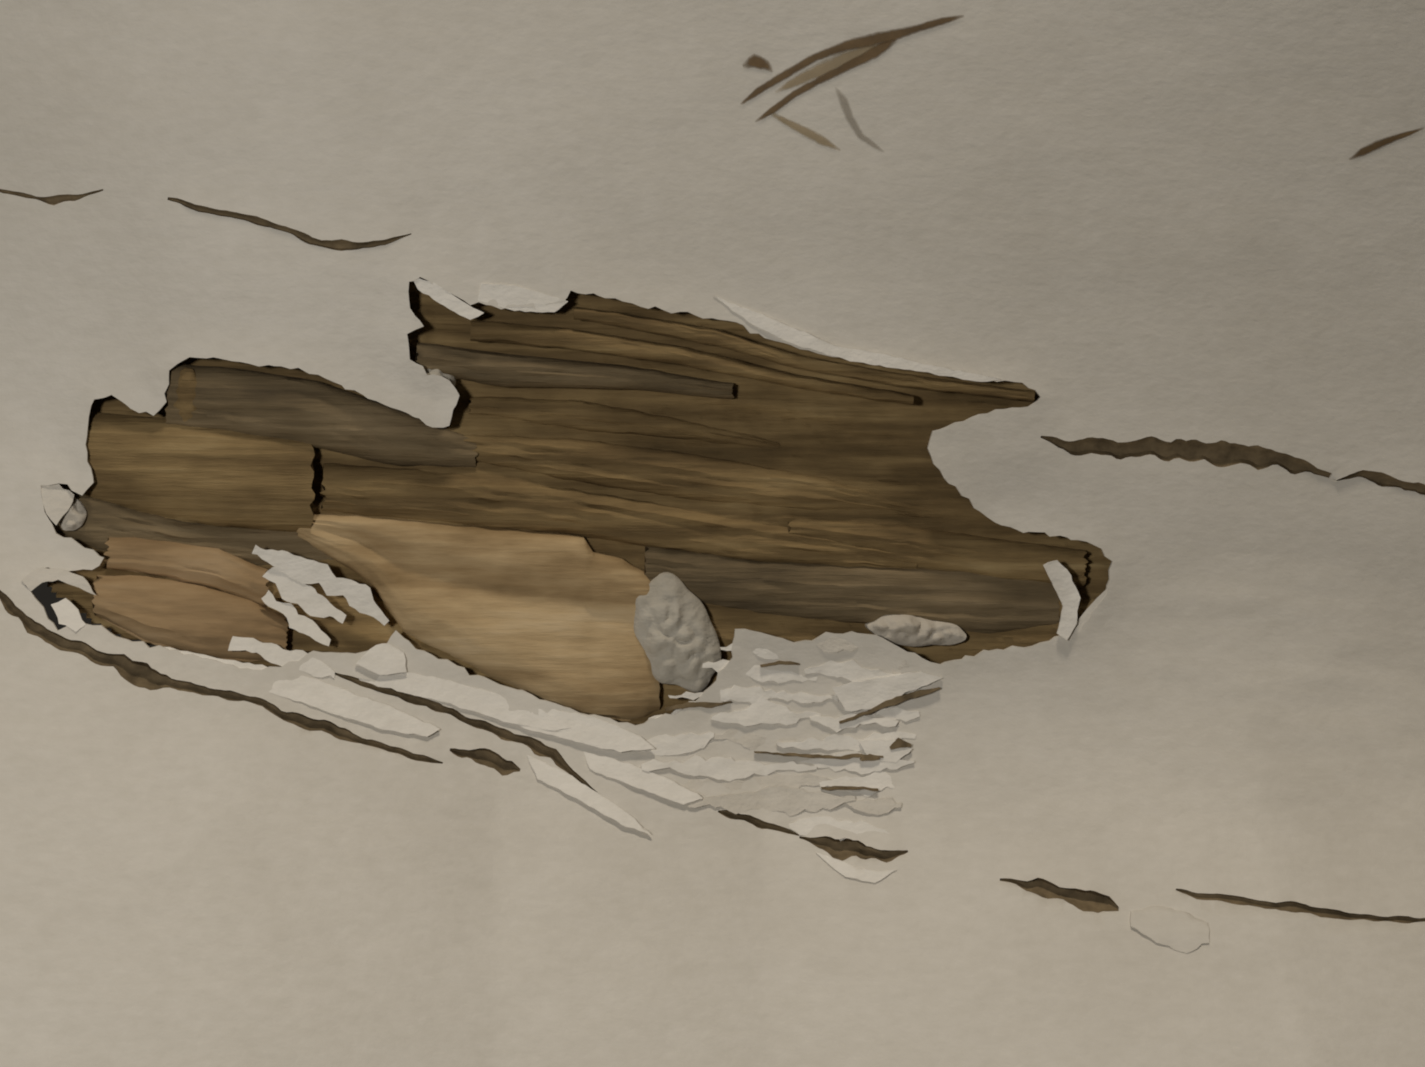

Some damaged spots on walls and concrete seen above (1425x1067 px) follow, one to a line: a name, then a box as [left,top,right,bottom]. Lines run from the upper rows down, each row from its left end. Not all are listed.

crack [0,189,103,205]
crack [168,197,411,251]
crack [1041,436,1425,495]
spalling [22,277,1111,841]
crack [1000,878,1425,953]